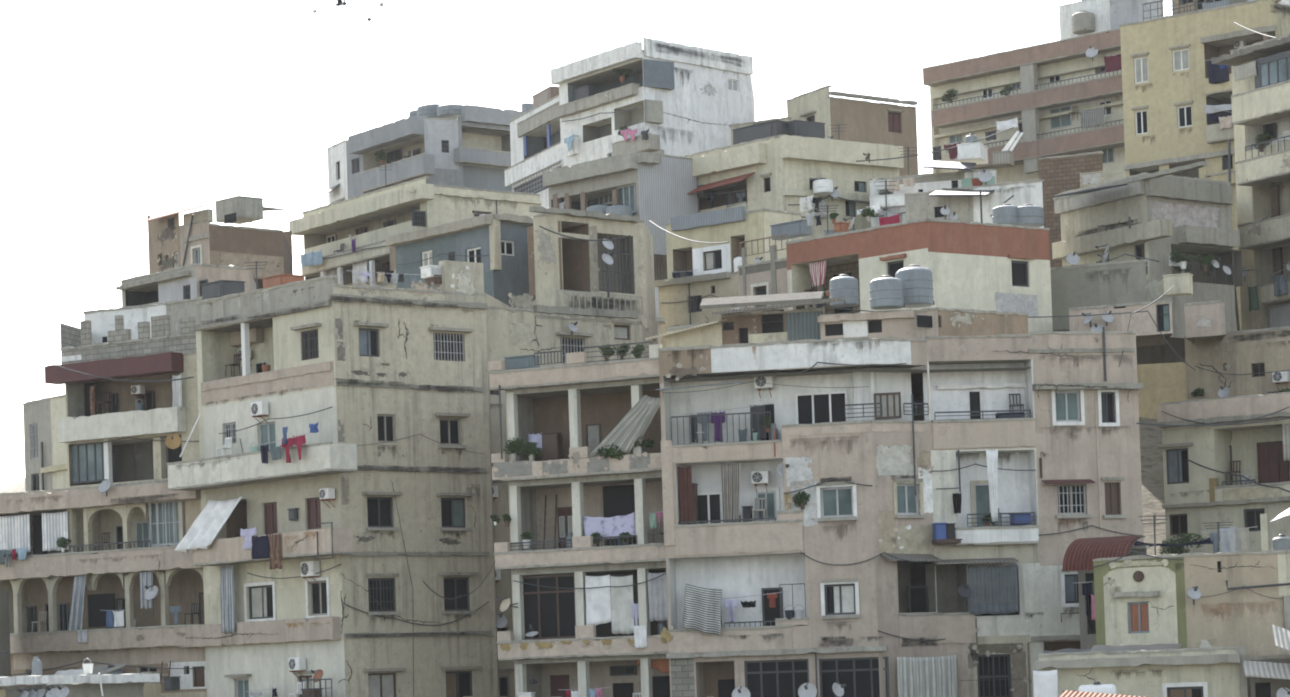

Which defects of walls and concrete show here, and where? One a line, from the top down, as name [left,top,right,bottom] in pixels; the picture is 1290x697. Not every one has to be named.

crack [397,318,409,359]
peeling [785,457,819,527]
peeling [876,444,934,554]